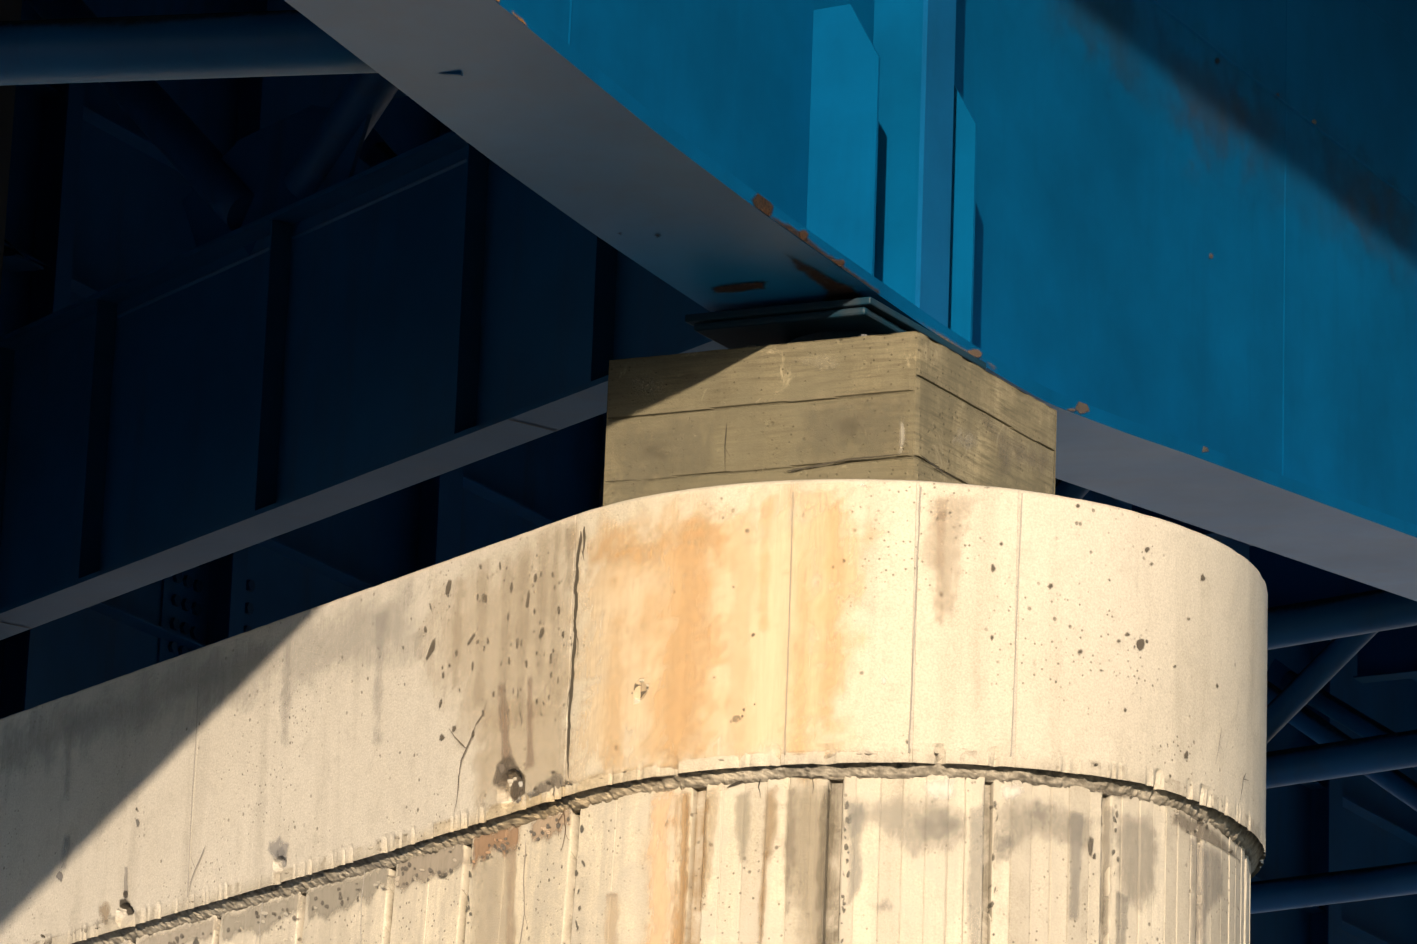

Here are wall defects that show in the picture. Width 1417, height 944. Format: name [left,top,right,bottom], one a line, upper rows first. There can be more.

rust [713,282,764,293]
rust [753,193,879,301]
rust [587,511,821,753]